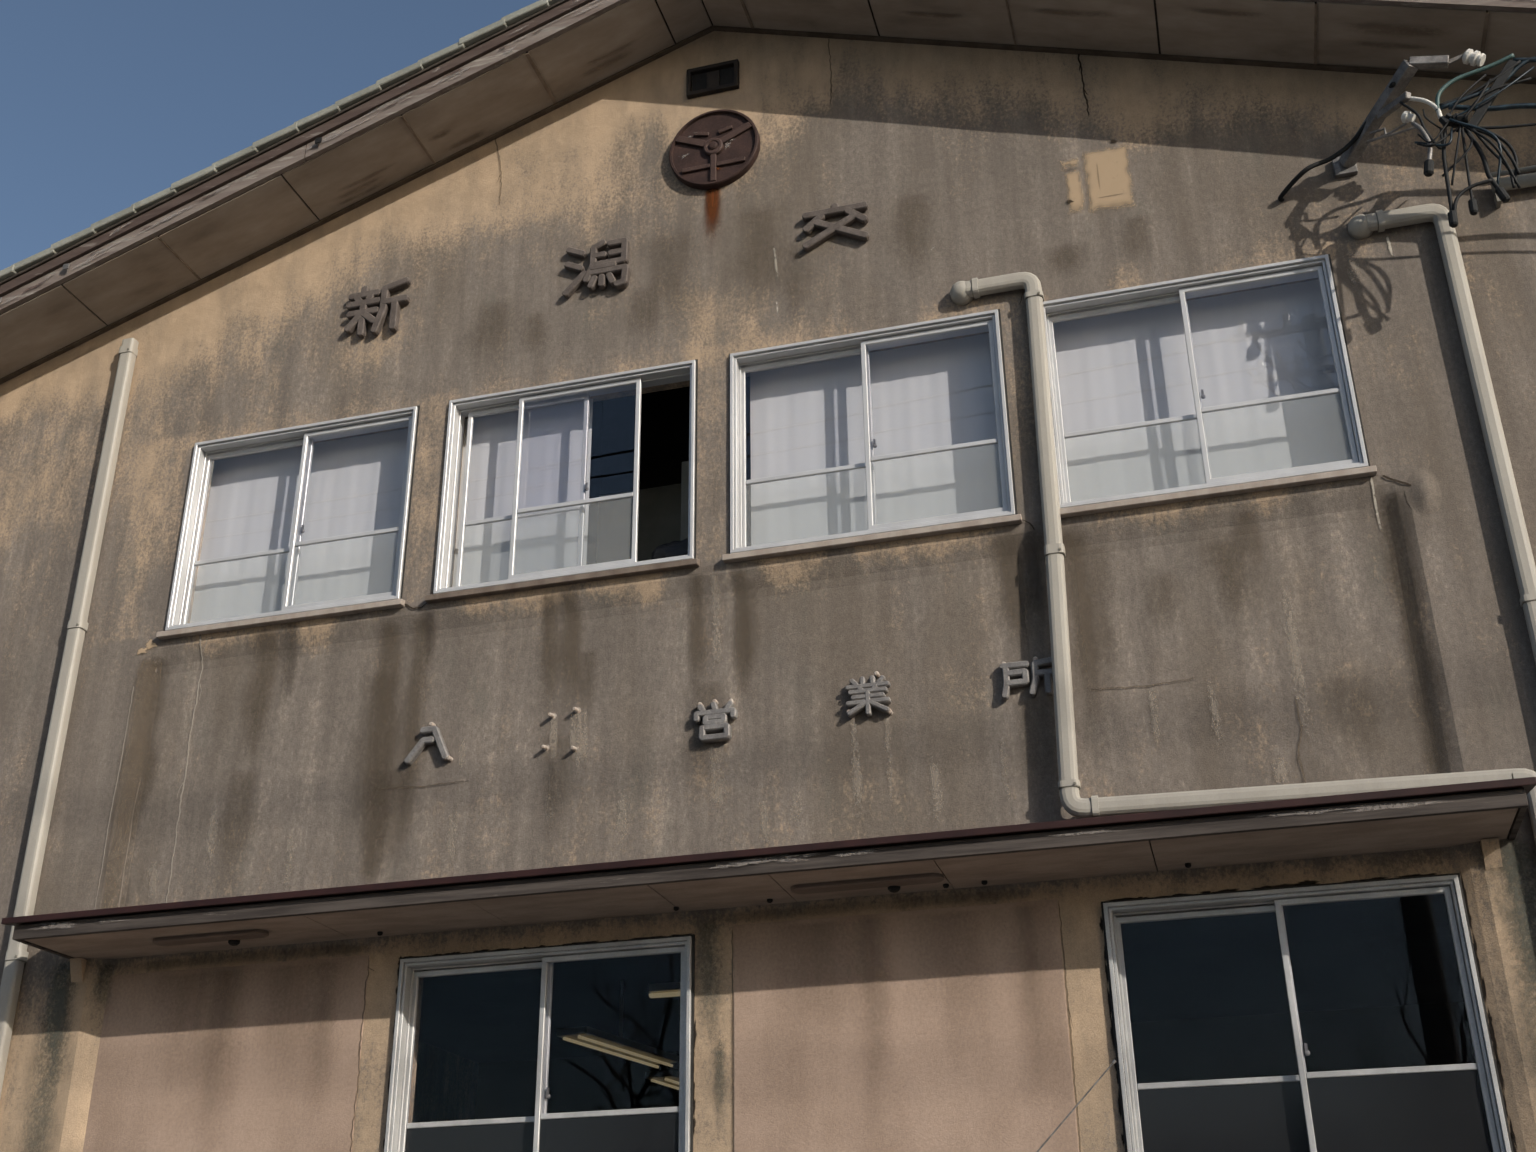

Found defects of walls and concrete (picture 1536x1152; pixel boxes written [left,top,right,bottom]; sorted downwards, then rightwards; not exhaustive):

corrosion [707,188,718,225]
damp [692,573,748,663]
damp [999,538,1026,621]
damp [1370,478,1442,767]
crack [166,636,207,903]
damp [28,965,71,1152]